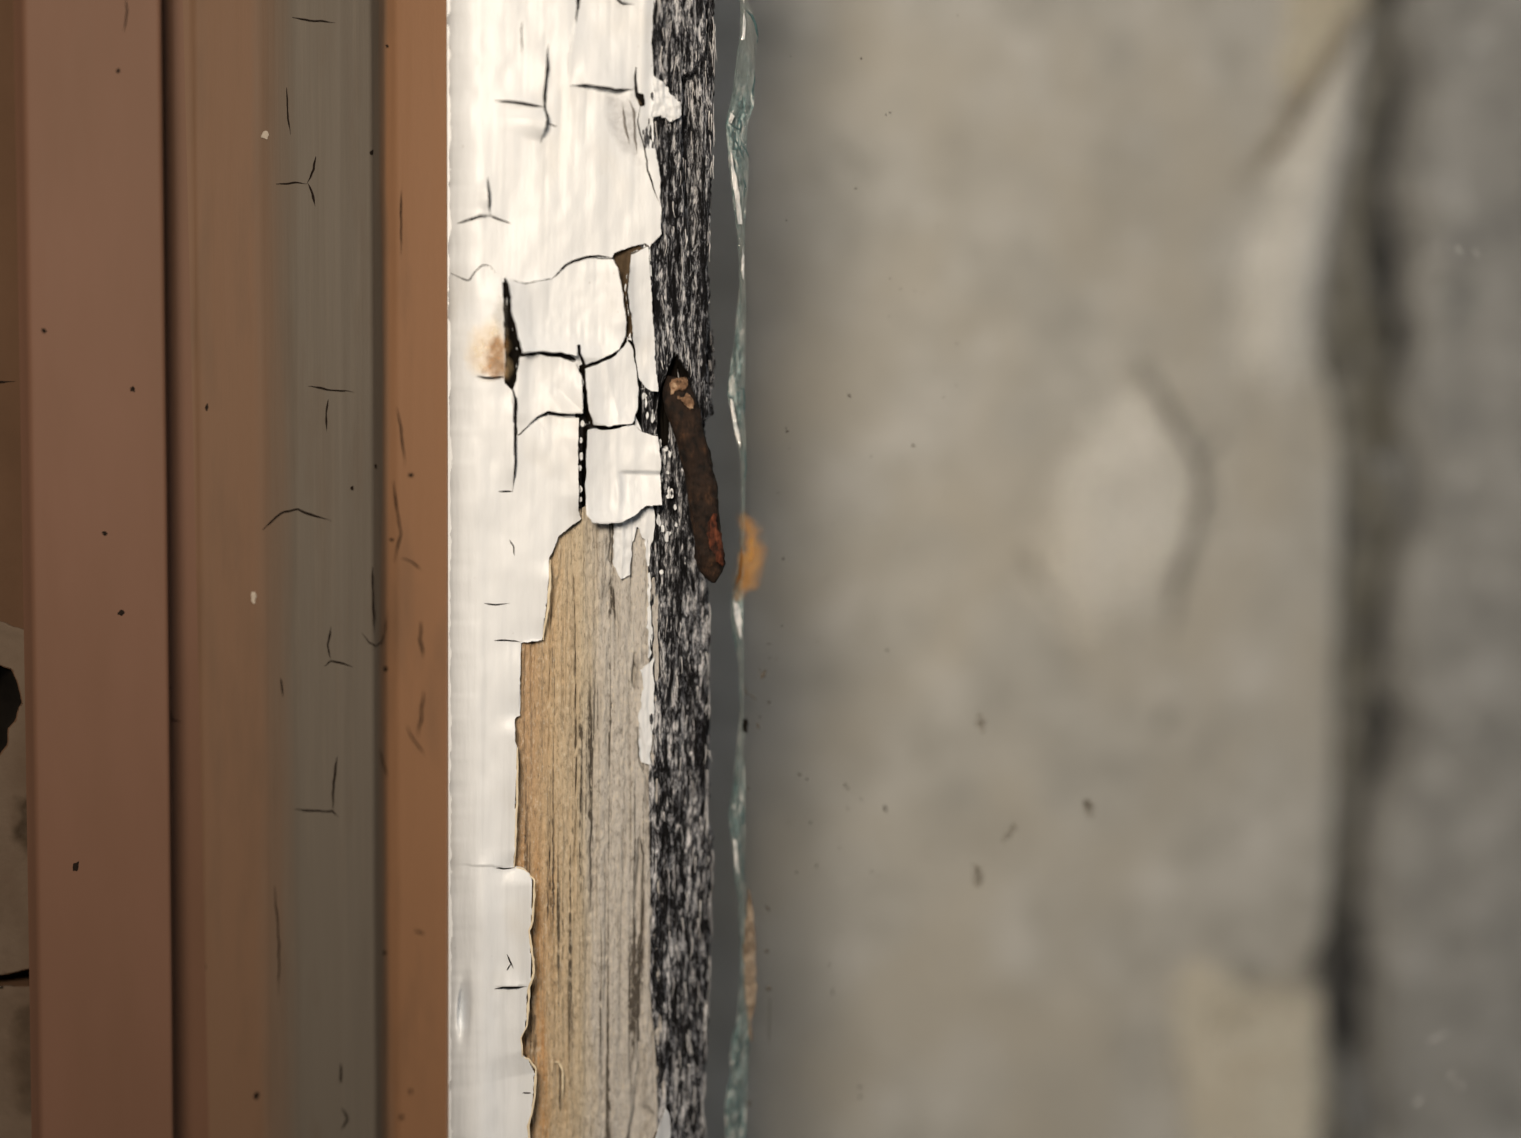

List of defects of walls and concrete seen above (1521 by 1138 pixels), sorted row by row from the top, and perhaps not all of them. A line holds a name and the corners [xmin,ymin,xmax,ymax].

crack [495,0,659,201]
crack [397,193,405,248]
crack [457,178,509,224]
crack [451,255,612,284]
crack [477,344,644,517]
rust [707,513,754,591]
peeling [506,247,671,1138]